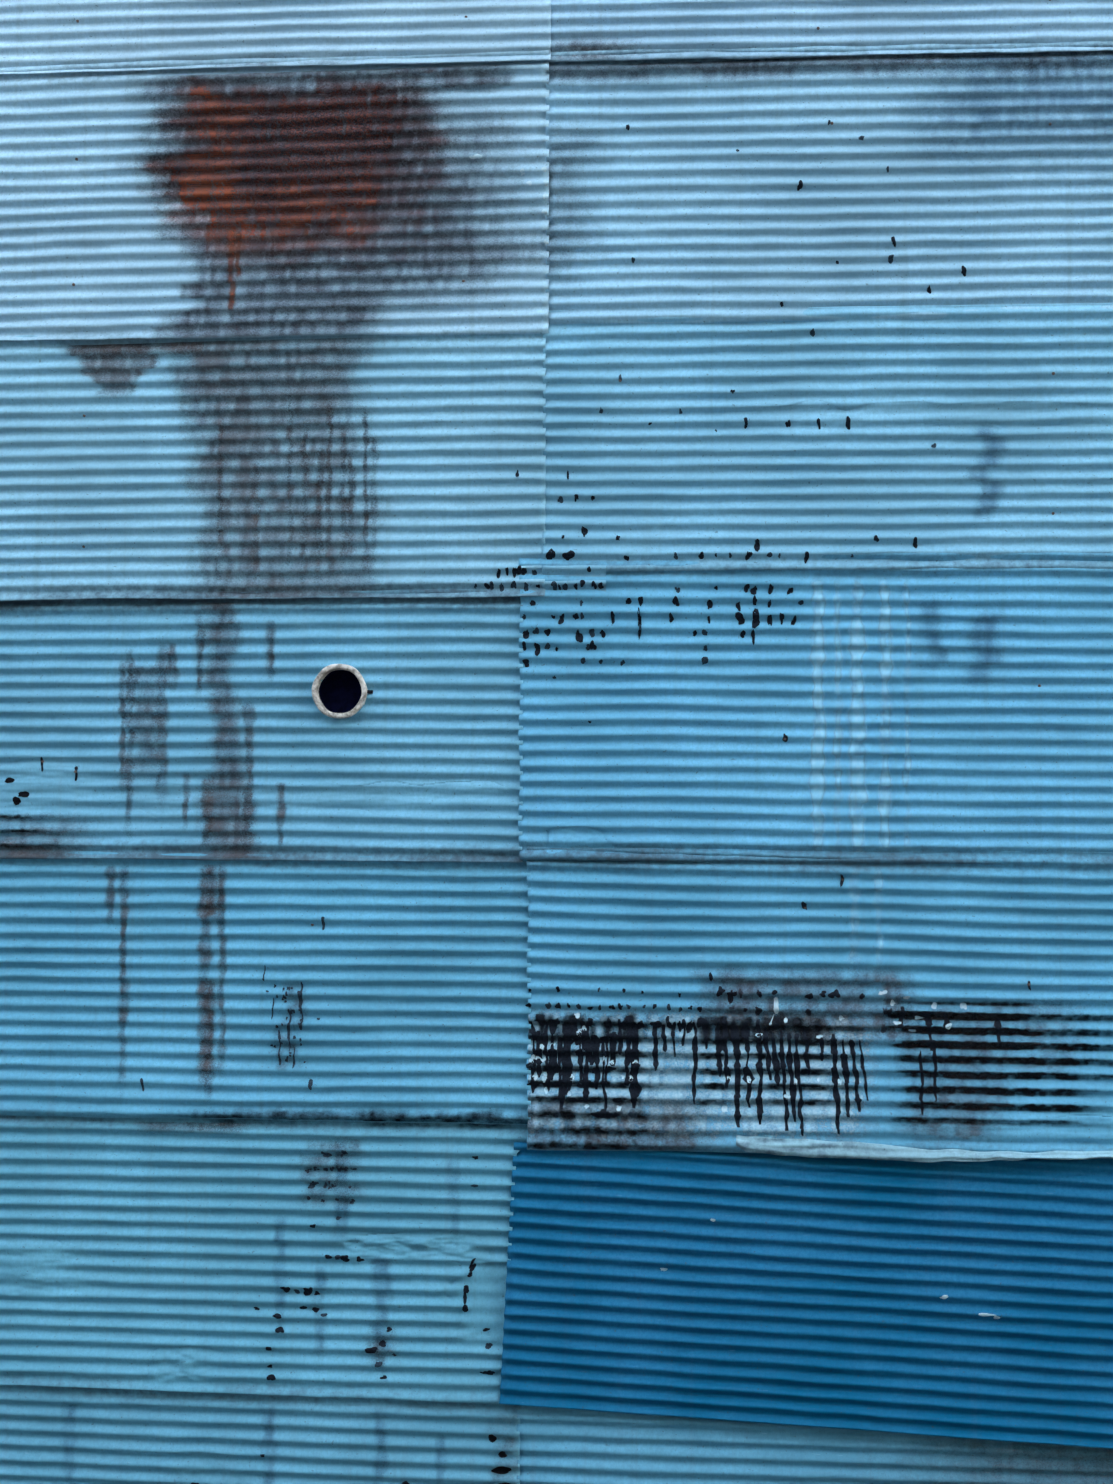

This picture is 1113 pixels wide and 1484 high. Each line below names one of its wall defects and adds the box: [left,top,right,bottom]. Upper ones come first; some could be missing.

rust [146,62,511,337]
leakage [878,990,1113,1136]